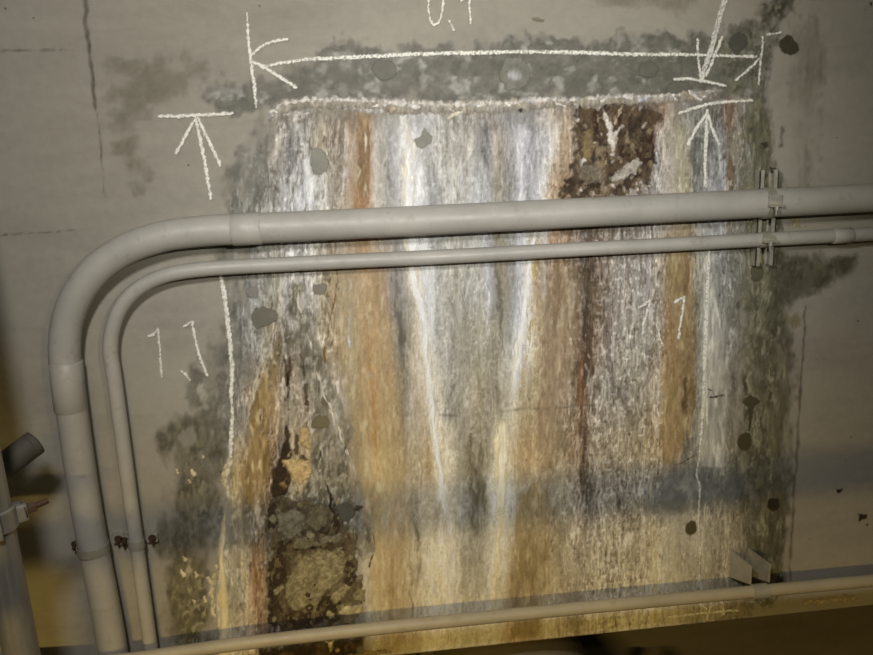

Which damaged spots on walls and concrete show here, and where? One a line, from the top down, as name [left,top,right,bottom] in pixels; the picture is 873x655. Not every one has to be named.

corrosion [359,117,370,198]
water stain [208,0,792,213]
spalling [554,103,660,199]
water stain [245,218,778,258]
corrosion [578,261,596,397]
corrosion [658,251,695,466]
corrosion [242,364,274,505]
water stain [157,246,855,645]
spalling [266,426,365,632]
spalling [259,637,391,655]
water stain [345,596,776,655]